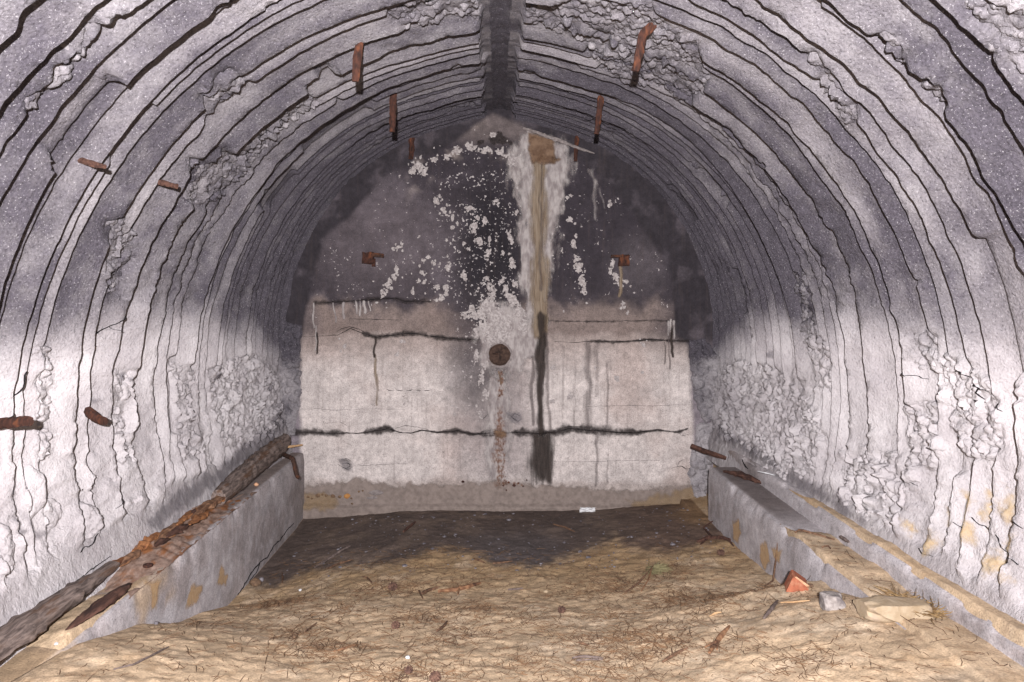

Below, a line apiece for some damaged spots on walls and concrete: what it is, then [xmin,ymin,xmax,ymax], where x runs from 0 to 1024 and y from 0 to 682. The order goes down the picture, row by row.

spalling [181,91,317,205]
spalling [168,320,303,461]
crack [304,297,477,342]
crack [295,389,690,469]
damp [303,131,694,519]
corrosion [494,412,507,484]
crack [555,320,687,343]
spalling [687,271,832,498]
spalling [841,329,1003,529]
crack [957,371,1001,411]